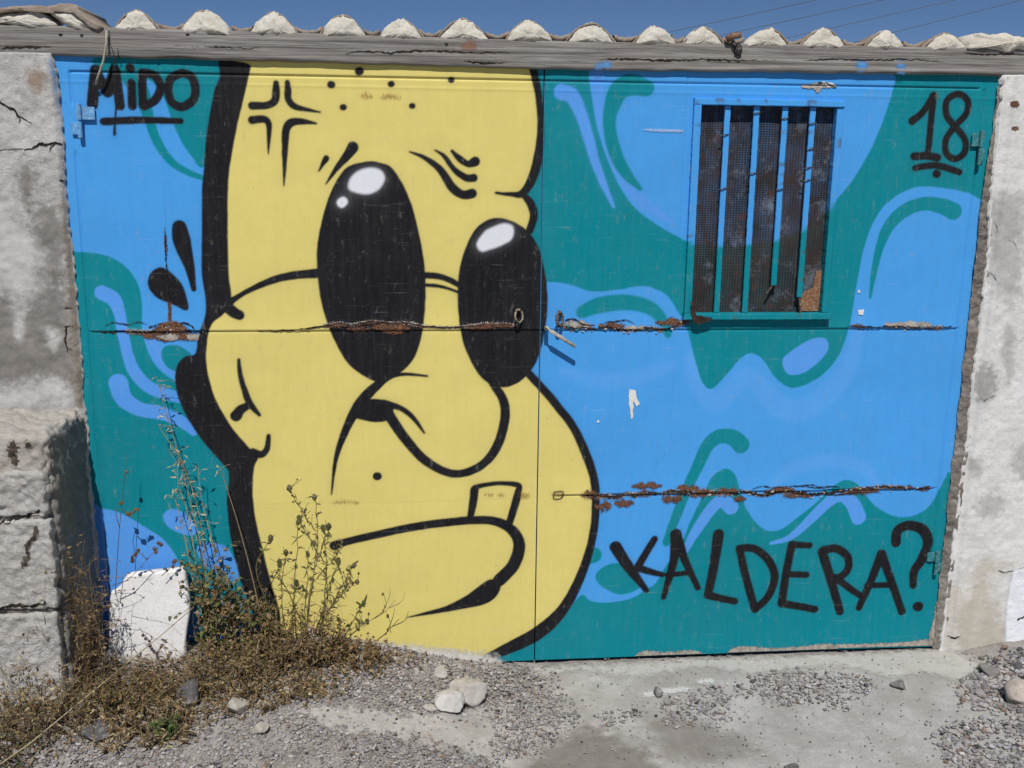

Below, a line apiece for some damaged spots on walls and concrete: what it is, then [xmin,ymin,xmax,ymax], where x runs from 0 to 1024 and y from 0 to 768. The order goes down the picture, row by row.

crack [0,101,63,152]
corrosion [690,301,712,324]
corrosion [126,320,193,343]
peeling [629,389,640,419]